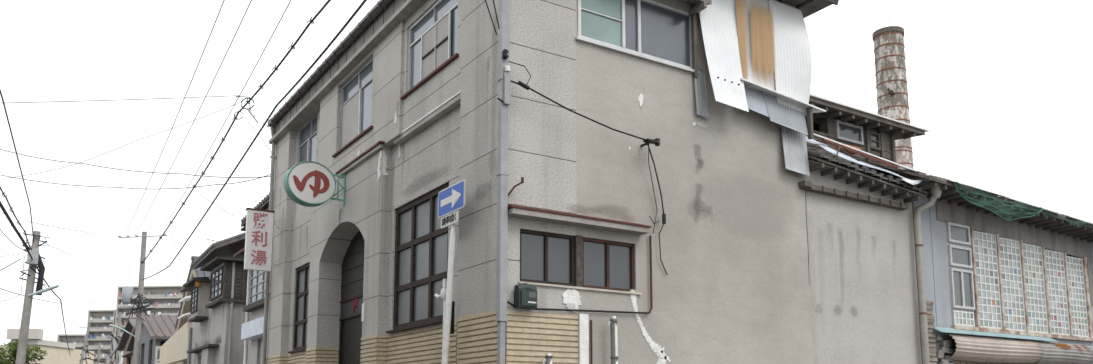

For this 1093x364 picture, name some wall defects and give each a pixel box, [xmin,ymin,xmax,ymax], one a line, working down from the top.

rust [736,0,775,79]